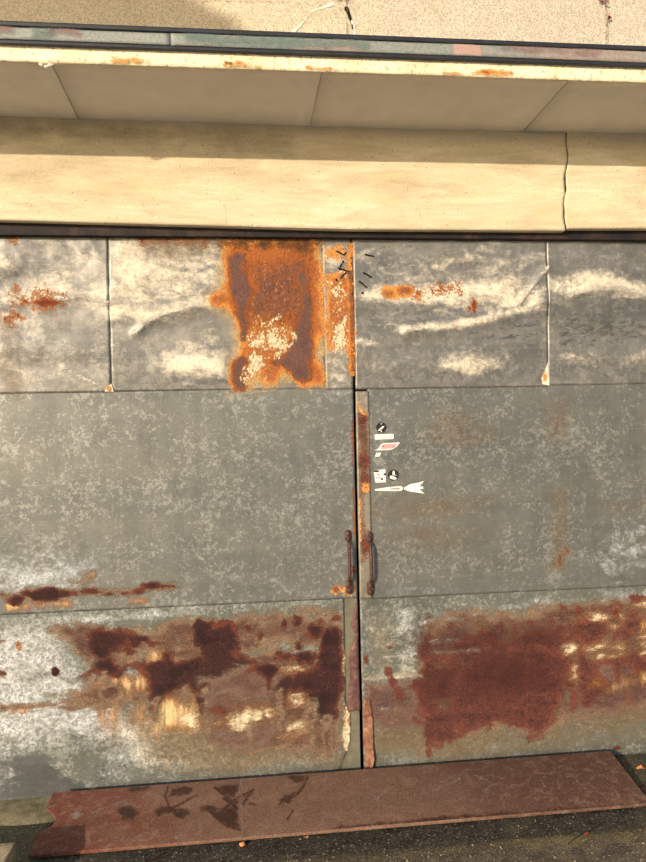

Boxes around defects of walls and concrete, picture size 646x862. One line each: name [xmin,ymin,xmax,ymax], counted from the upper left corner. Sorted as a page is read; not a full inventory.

crack [291,2,356,35]
corrosion [110,56,149,64]
corrosion [220,60,261,68]
crack [561,133,569,231]
corrosion [0,281,74,329]
corrosion [137,238,357,392]
corrosion [381,280,478,313]
corrosion [351,405,370,572]
corrosion [0,571,176,611]
corrosion [330,584,356,597]
corrosion [0,606,346,761]
corrosion [364,592,646,756]